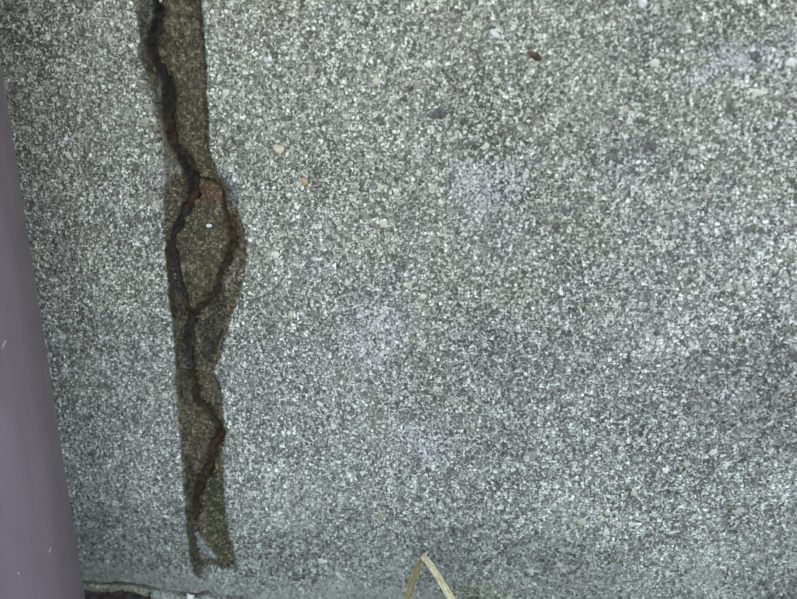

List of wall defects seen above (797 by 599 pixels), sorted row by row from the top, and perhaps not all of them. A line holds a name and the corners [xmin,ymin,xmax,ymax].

crack [146,0,239,522]